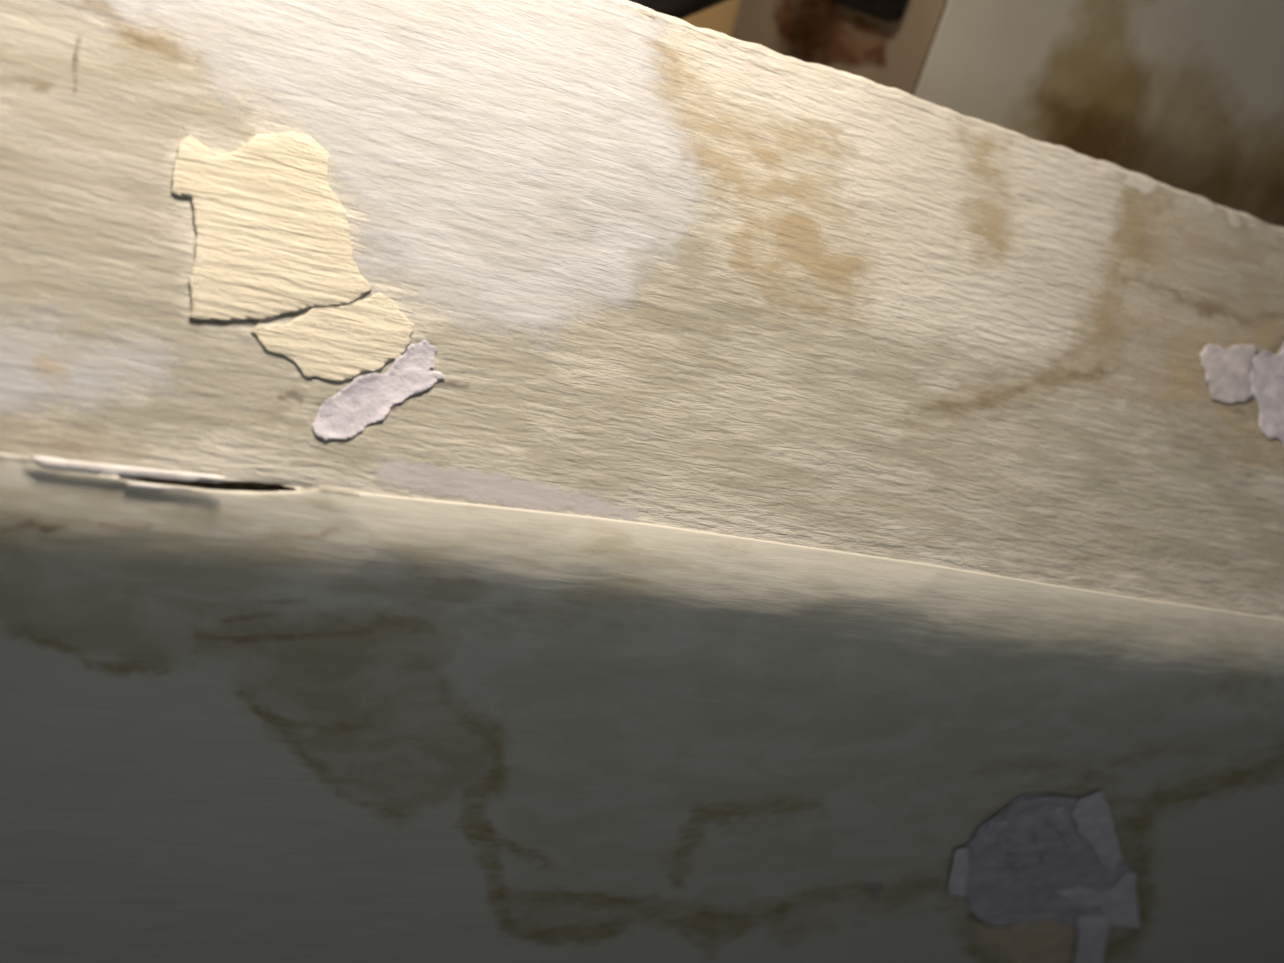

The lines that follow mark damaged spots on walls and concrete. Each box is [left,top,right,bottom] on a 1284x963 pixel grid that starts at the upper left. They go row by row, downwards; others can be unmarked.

damp [1045,5,1161,183]
peeling [104,0,712,440]
damp [767,214,860,284]
crack [28,456,342,491]
flaking render [1200,344,1284,445]
flaking render [948,791,1140,963]